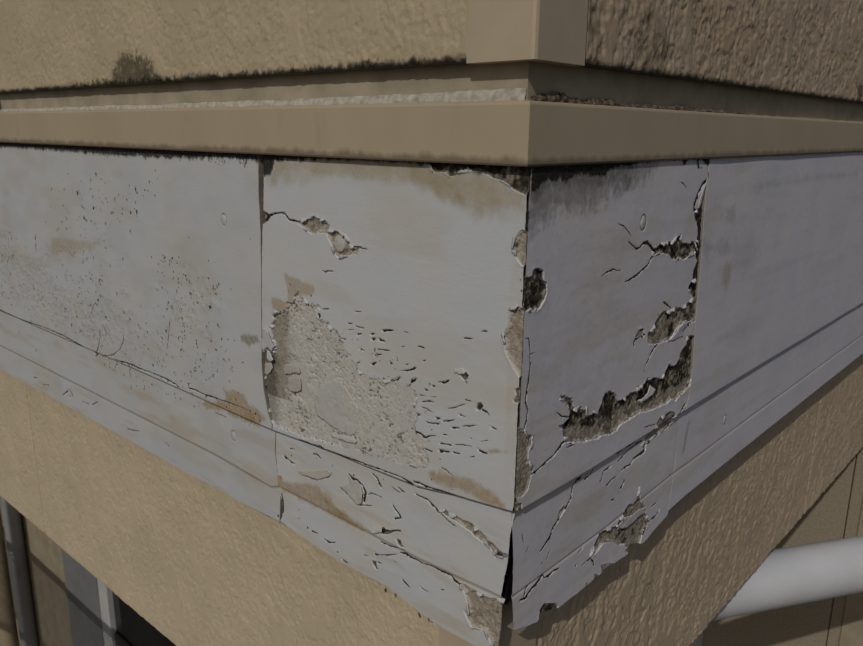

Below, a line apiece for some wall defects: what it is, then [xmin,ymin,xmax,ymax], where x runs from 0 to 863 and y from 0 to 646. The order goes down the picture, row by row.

peeling [427,164,473,178]
leakage [529,161,649,192]
peeling [264,212,367,260]
peeling [501,210,546,375]
crack [602,224,698,282]
crack [0,310,249,418]
peeling [261,284,437,470]
peeling [558,278,696,448]
crack [284,311,685,601]
spalling [513,429,533,513]
spalling [368,527,505,646]
spalling [578,487,658,587]